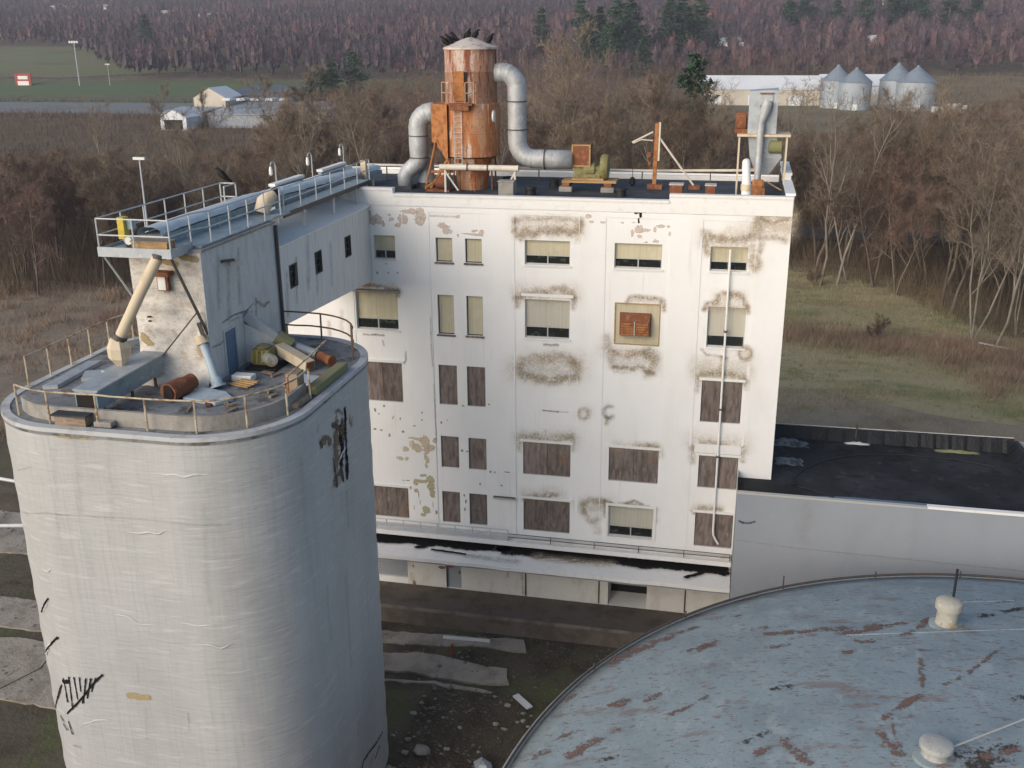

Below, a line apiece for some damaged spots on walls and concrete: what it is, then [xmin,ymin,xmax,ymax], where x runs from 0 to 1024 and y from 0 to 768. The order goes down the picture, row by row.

peeling [369,208,426,227]
damp [514,220,582,237]
peeling [620,222,671,243]
spalling [319,407,353,487]
peeling [374,405,438,517]
corrosion [607,626,698,665]
corrosion [751,617,930,654]
corrosion [942,648,1003,685]
corrosion [875,649,930,757]
corrosion [744,729,814,766]
corrosion [954,742,1022,768]